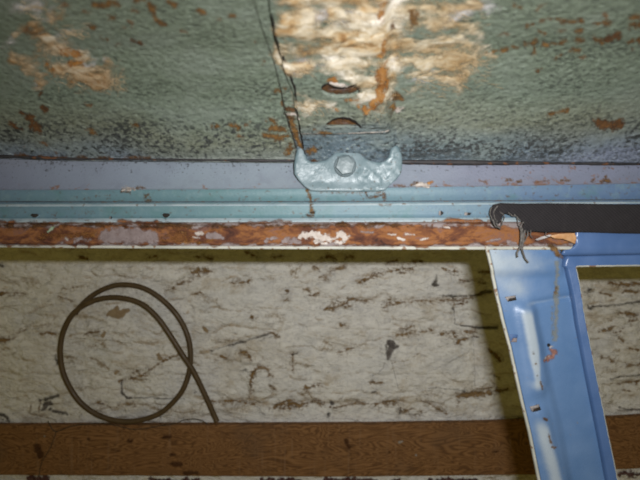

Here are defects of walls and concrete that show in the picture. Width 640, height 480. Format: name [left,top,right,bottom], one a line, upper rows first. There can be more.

corrosion [408,9,420,27]
crack [255,5,389,154]
corrosion [322,40,404,115]
peeling [287,100,335,120]
corrosion [594,118,625,131]
peeling [99,226,158,245]
peeling [194,231,224,240]
peeling [264,230,349,246]
peeling [535,233,576,244]